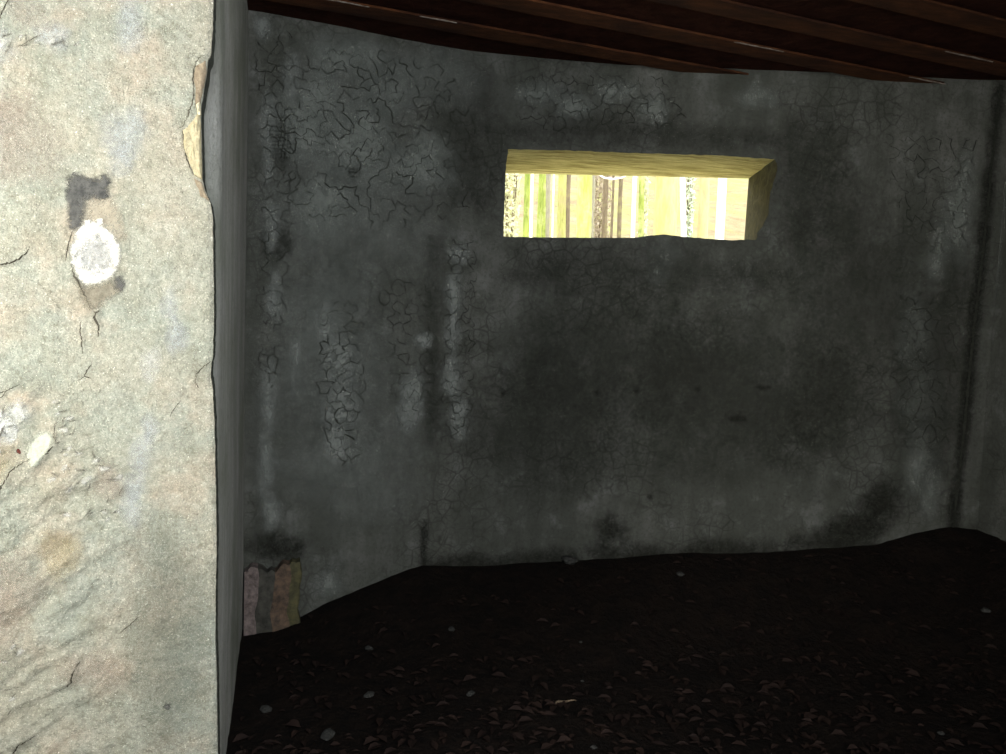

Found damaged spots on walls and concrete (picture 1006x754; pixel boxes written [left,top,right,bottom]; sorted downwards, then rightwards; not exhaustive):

spalling [183,61,209,201]
crack [516,72,686,136]
water stain [70,198,122,309]
crack [254,30,477,465]